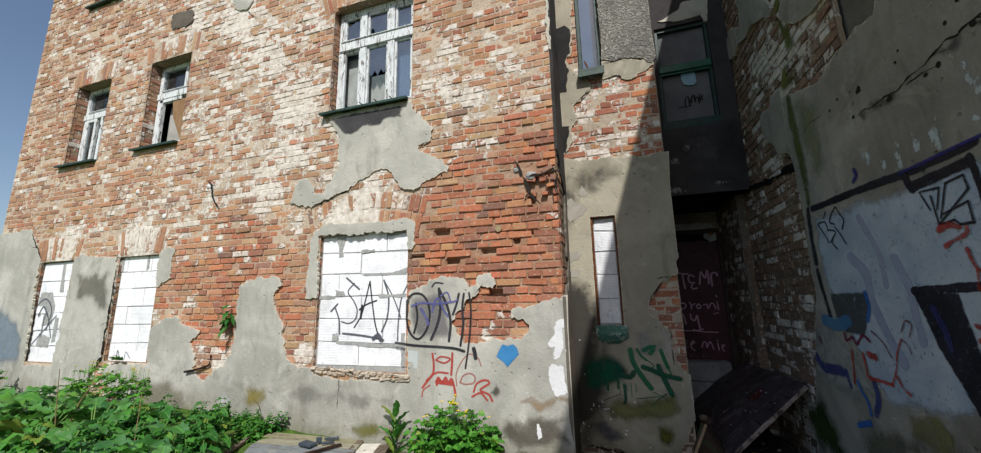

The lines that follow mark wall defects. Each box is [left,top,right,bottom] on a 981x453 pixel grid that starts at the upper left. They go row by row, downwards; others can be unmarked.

flaking render [0,0,717,453]
flaking render [722,0,872,453]
crack [856,12,981,116]